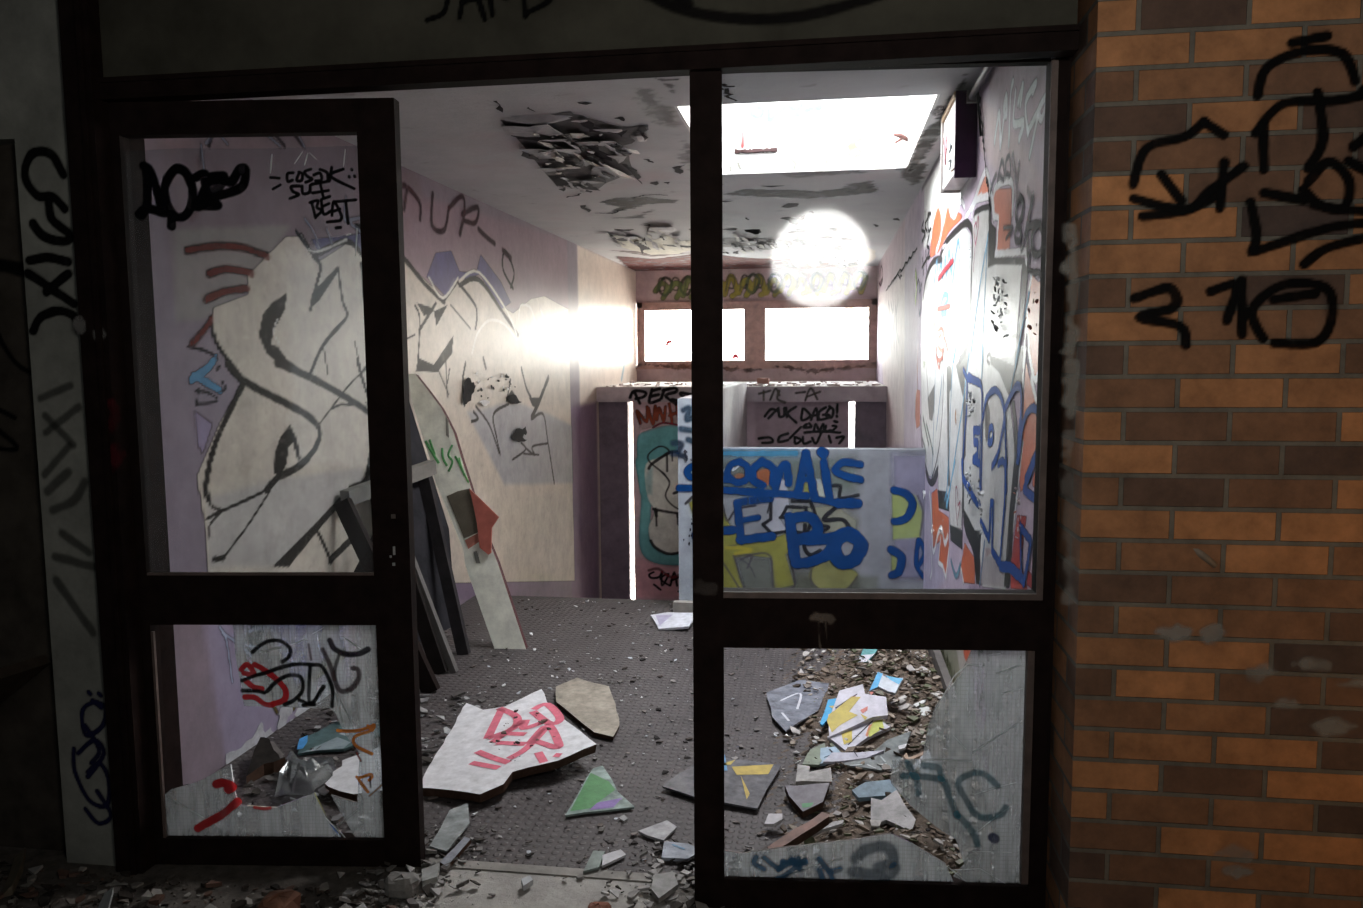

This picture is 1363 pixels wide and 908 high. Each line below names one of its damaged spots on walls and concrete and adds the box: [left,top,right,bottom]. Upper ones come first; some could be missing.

peeling [494,101,684,212]
peeling [594,224,691,255]
peeling [723,203,876,268]